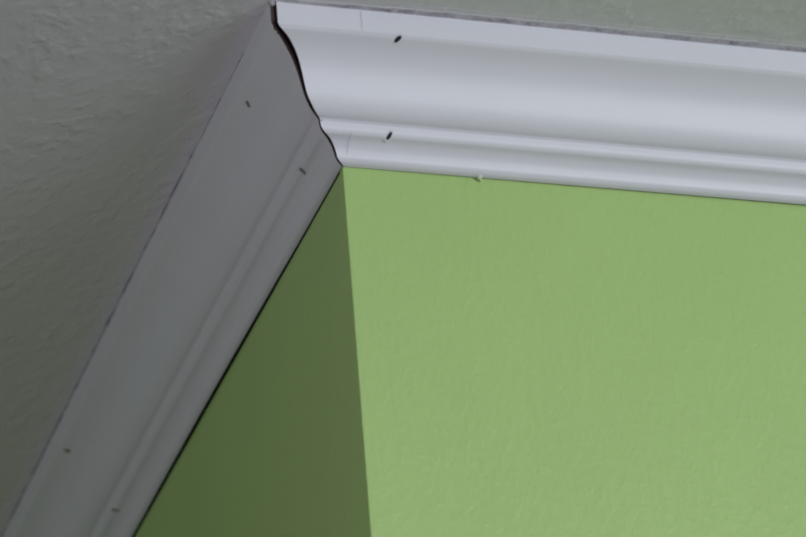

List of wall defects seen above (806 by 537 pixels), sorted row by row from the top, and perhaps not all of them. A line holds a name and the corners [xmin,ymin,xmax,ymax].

crack [268,0,806,164]
crack [132,172,340,537]